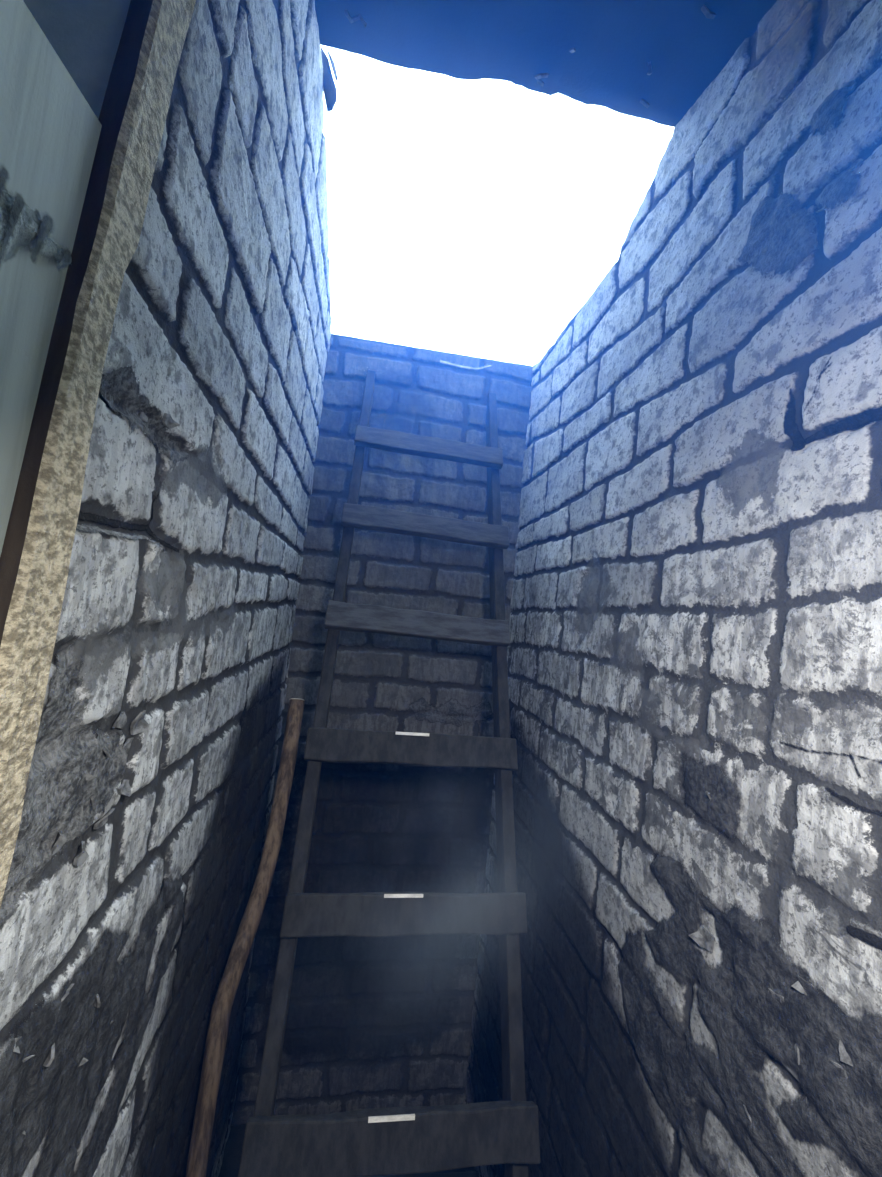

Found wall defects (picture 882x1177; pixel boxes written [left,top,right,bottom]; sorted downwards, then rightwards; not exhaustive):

spalling [100,366,188,466]